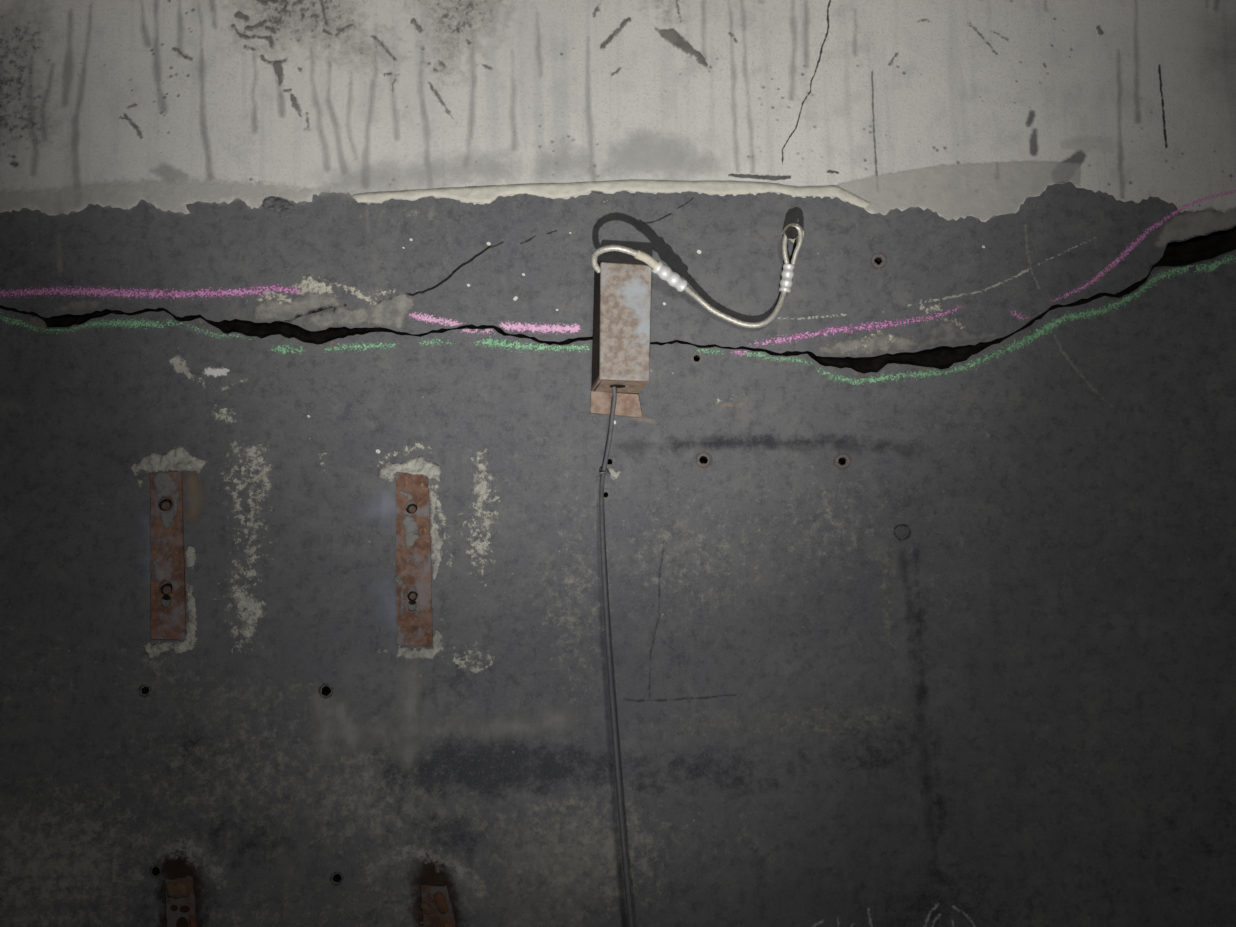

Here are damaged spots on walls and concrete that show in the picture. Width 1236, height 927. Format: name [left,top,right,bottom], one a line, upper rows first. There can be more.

crack [782,0,831,163]
peeling [262,196,294,216]
crack [646,198,694,223]
peeling [353,162,1080,219]
crack [870,72,878,176]
damp [1027,111,1037,155]
damp [1053,151,1085,183]
crack [0,230,592,345]
crack [650,226,1236,373]
rust [402,515,419,548]
rust [161,850,201,927]
rust [412,854,459,927]